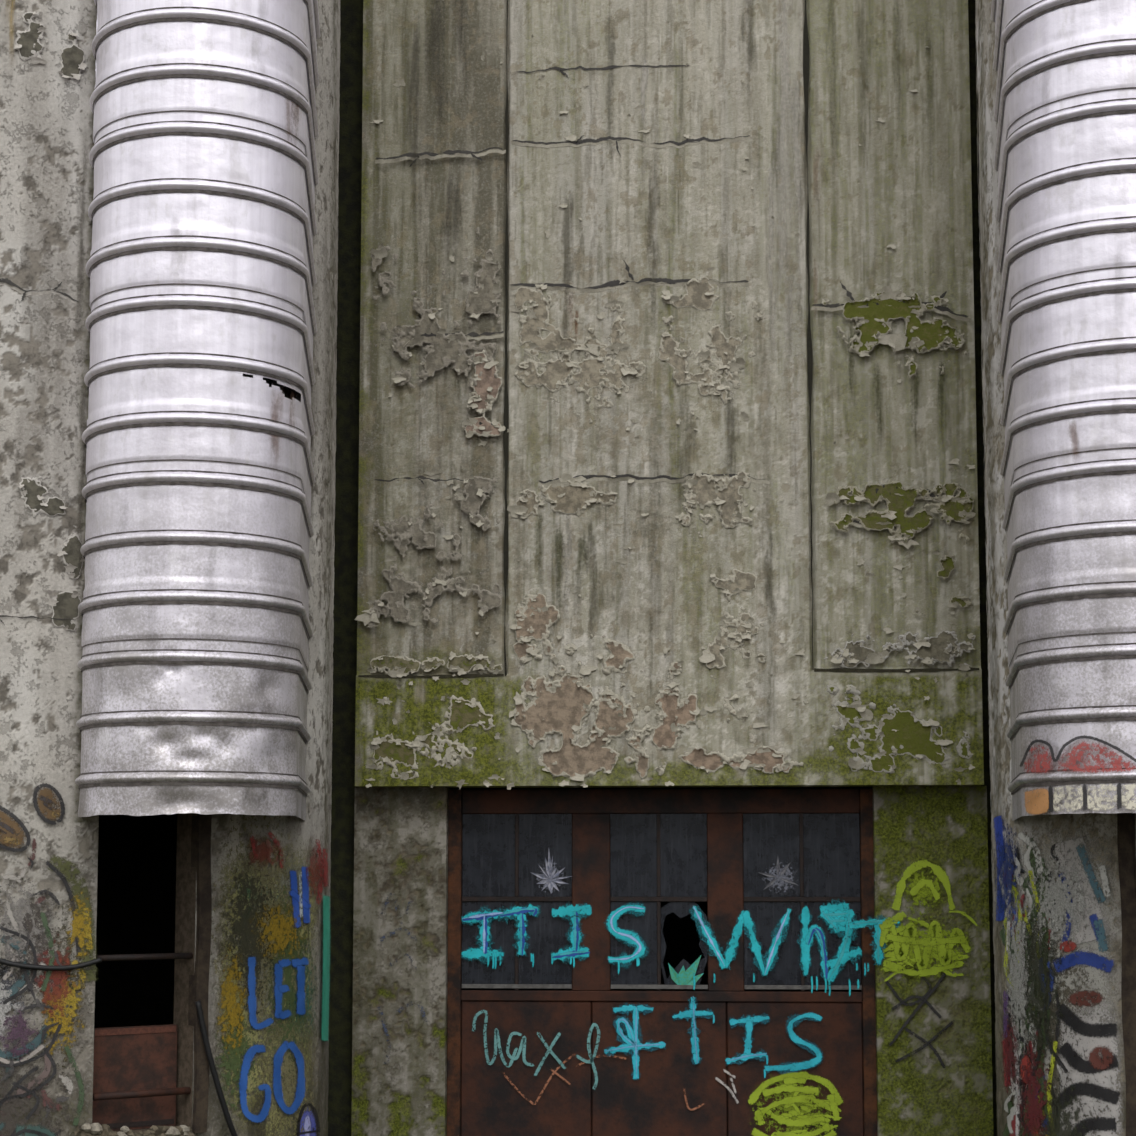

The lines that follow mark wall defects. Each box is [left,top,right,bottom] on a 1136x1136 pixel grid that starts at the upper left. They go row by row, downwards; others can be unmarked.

crack [518,65,689,78]
crack [375,135,753,166]
crack [510,261,749,293]
peeling [369,243,765,446]
peeling [821,285,968,383]
peeling [355,469,618,629]
peeling [675,469,771,538]
spalling [826,458,976,579]
peeling [365,632,503,789]
peeling [509,568,811,788]
spalling [824,628,976,700]
peeling [827,684,975,785]